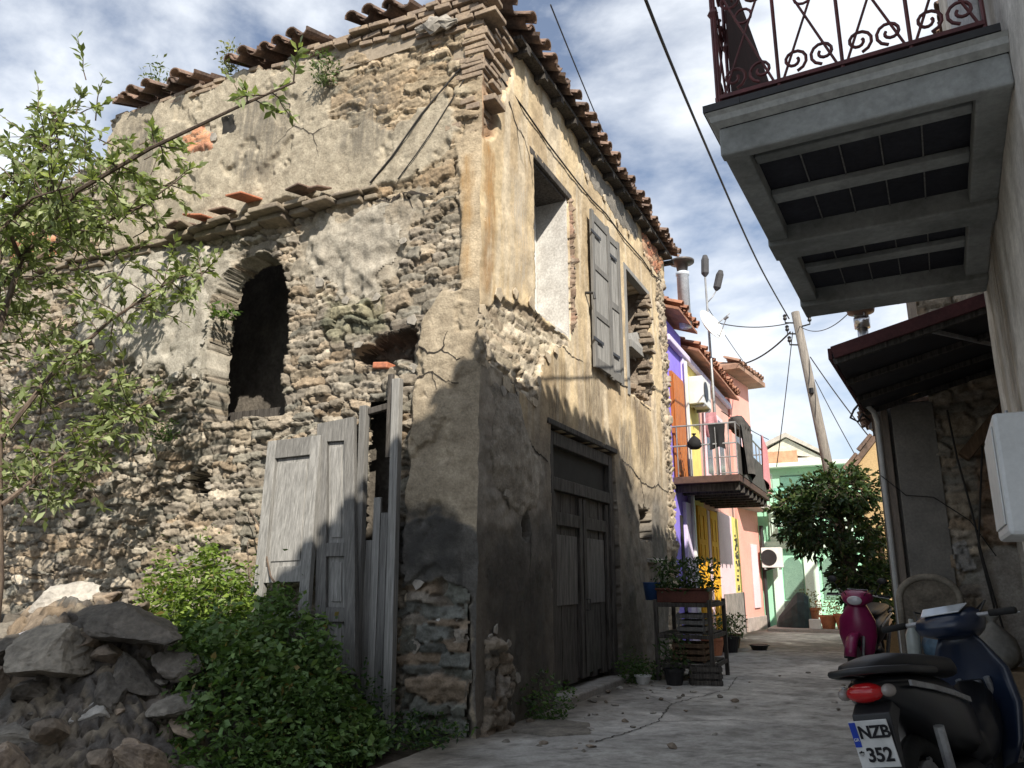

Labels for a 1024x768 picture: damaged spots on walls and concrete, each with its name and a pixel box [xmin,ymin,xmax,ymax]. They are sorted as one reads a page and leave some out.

spalling [180,114,236,159]
flaking render [305,202,408,304]
flaking render [94,246,214,379]
spalling [474,198,580,407]
spalling [354,314,419,373]
crack [417,331,464,386]
hole [176,471,212,498]
crack [622,459,673,506]
spalling [396,576,521,743]